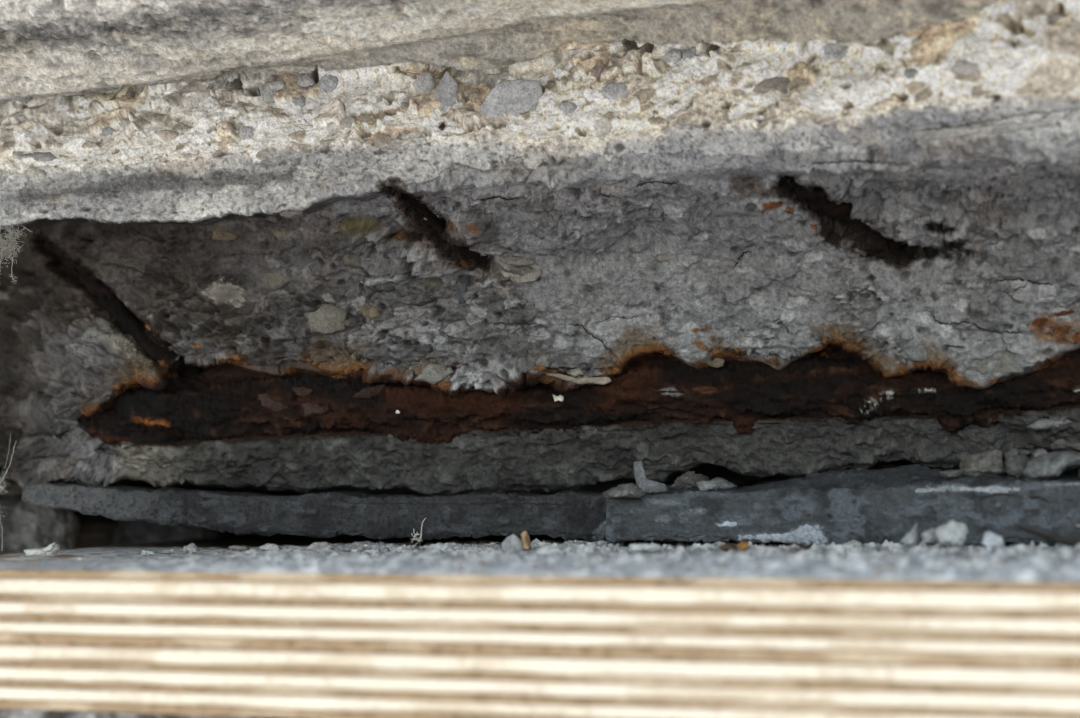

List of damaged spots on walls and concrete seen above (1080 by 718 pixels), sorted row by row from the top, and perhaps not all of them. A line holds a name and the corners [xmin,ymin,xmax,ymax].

spalling [0,0,1080,487]
rust [29,230,779,418]
rust [797,310,1080,390]
rust [136,419,169,427]
rust [117,429,393,449]
crack [111,455,266,527]
crack [972,492,1050,503]